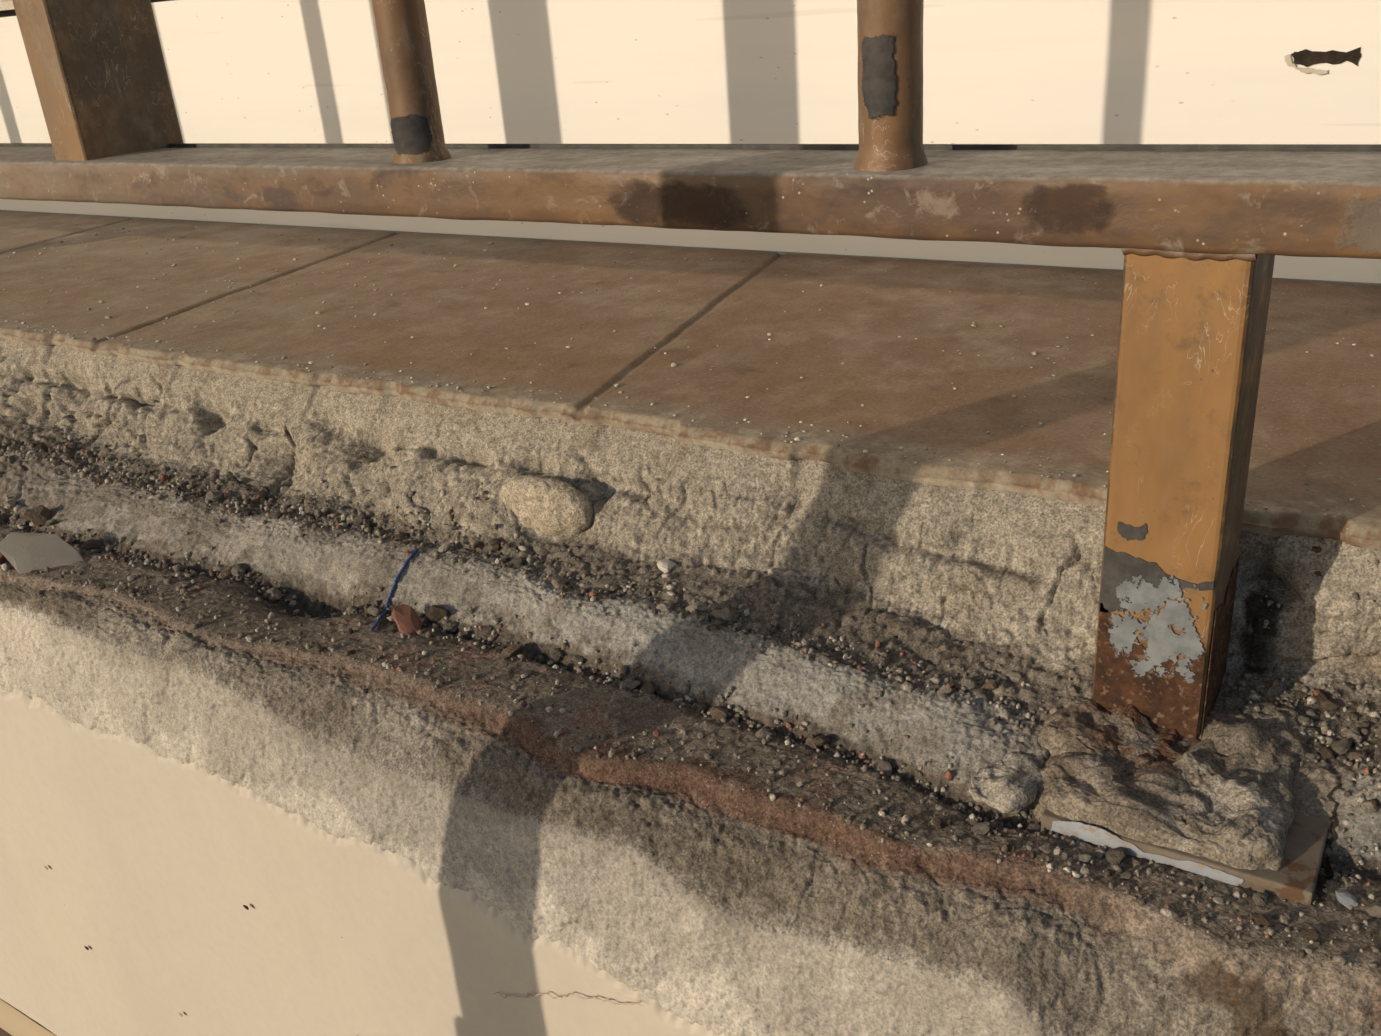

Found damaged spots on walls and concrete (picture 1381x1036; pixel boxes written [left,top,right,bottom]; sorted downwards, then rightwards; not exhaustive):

peeling [1026,185,1109,230]
peeling [1338,198,1381,253]
spalling [0,338,1215,724]
corrosion [1093,556,1240,739]
spalling [0,531,1381,1036]